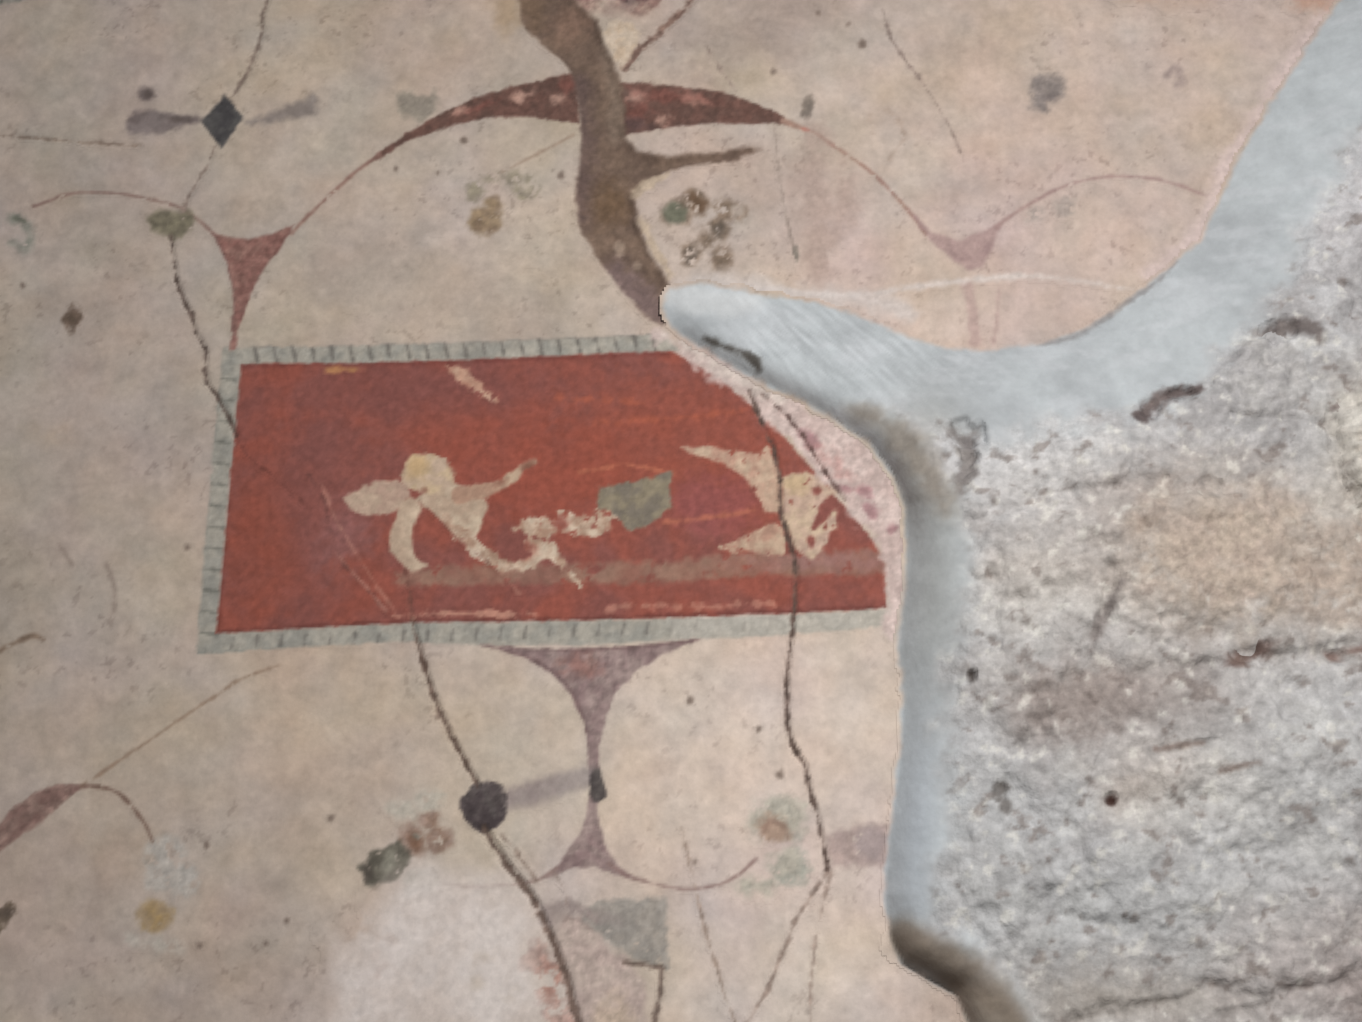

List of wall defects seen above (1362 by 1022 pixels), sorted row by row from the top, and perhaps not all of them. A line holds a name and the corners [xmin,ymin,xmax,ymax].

crack [230,0,272,98]
spalling [844,19,870,51]
crack [0,131,145,149]
crack [515,0,802,328]
flaking render [647,324,903,646]
crack [166,143,583,1022]
flaking render [926,127,1362,1022]
spalling [683,693,697,707]
crack [676,388,848,1022]
spalling [772,764,786,783]
crack [621,958,667,1022]